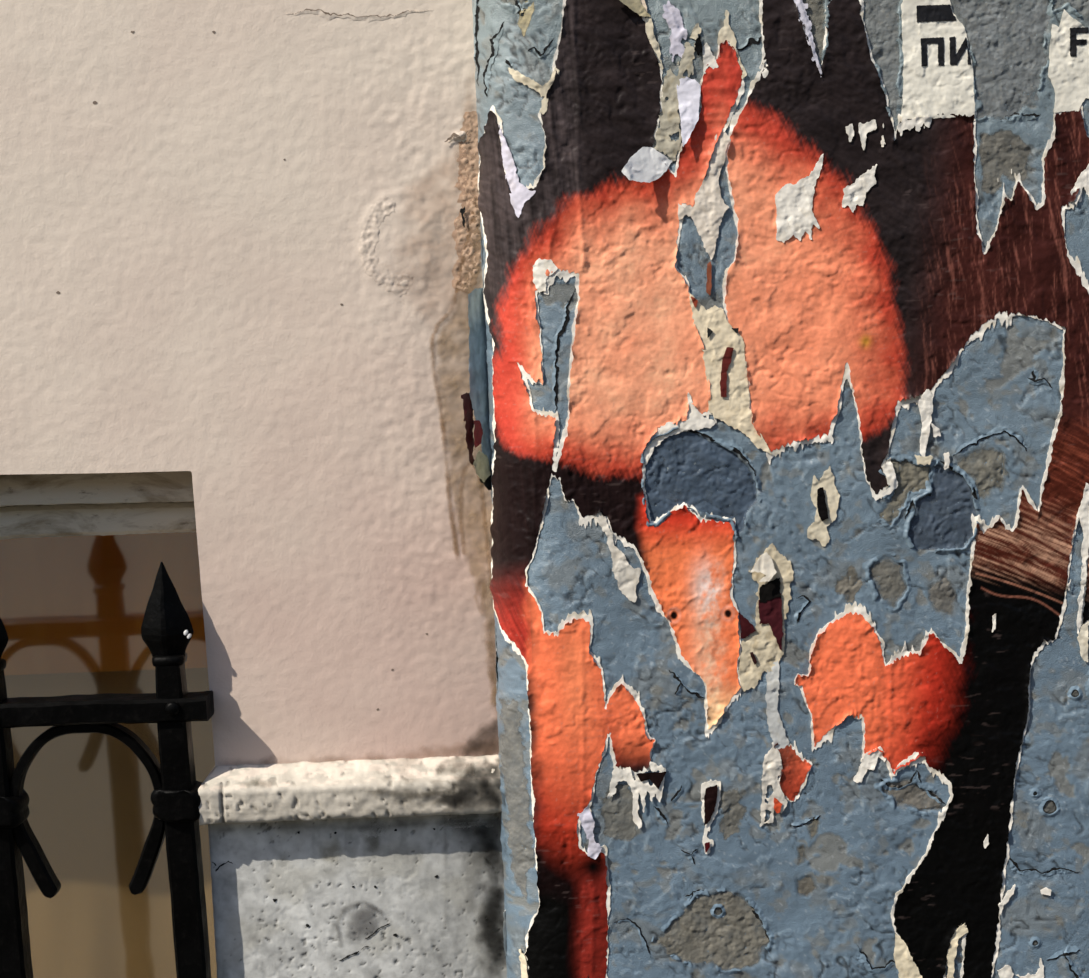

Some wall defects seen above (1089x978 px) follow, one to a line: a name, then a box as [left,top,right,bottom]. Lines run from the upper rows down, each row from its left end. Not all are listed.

crack [286,8,433,23]
crack [473,0,556,96]
peeling [803,0,830,67]
peeling [950,0,1089,193]
leakage [441,405,482,455]
peeling [640,427,762,541]
peeling [835,448,1007,613]
crack [669,670,704,698]
peeling [601,784,642,841]
crack [880,770,945,804]
leakage [483,888,504,959]
crack [1046,945,1081,978]